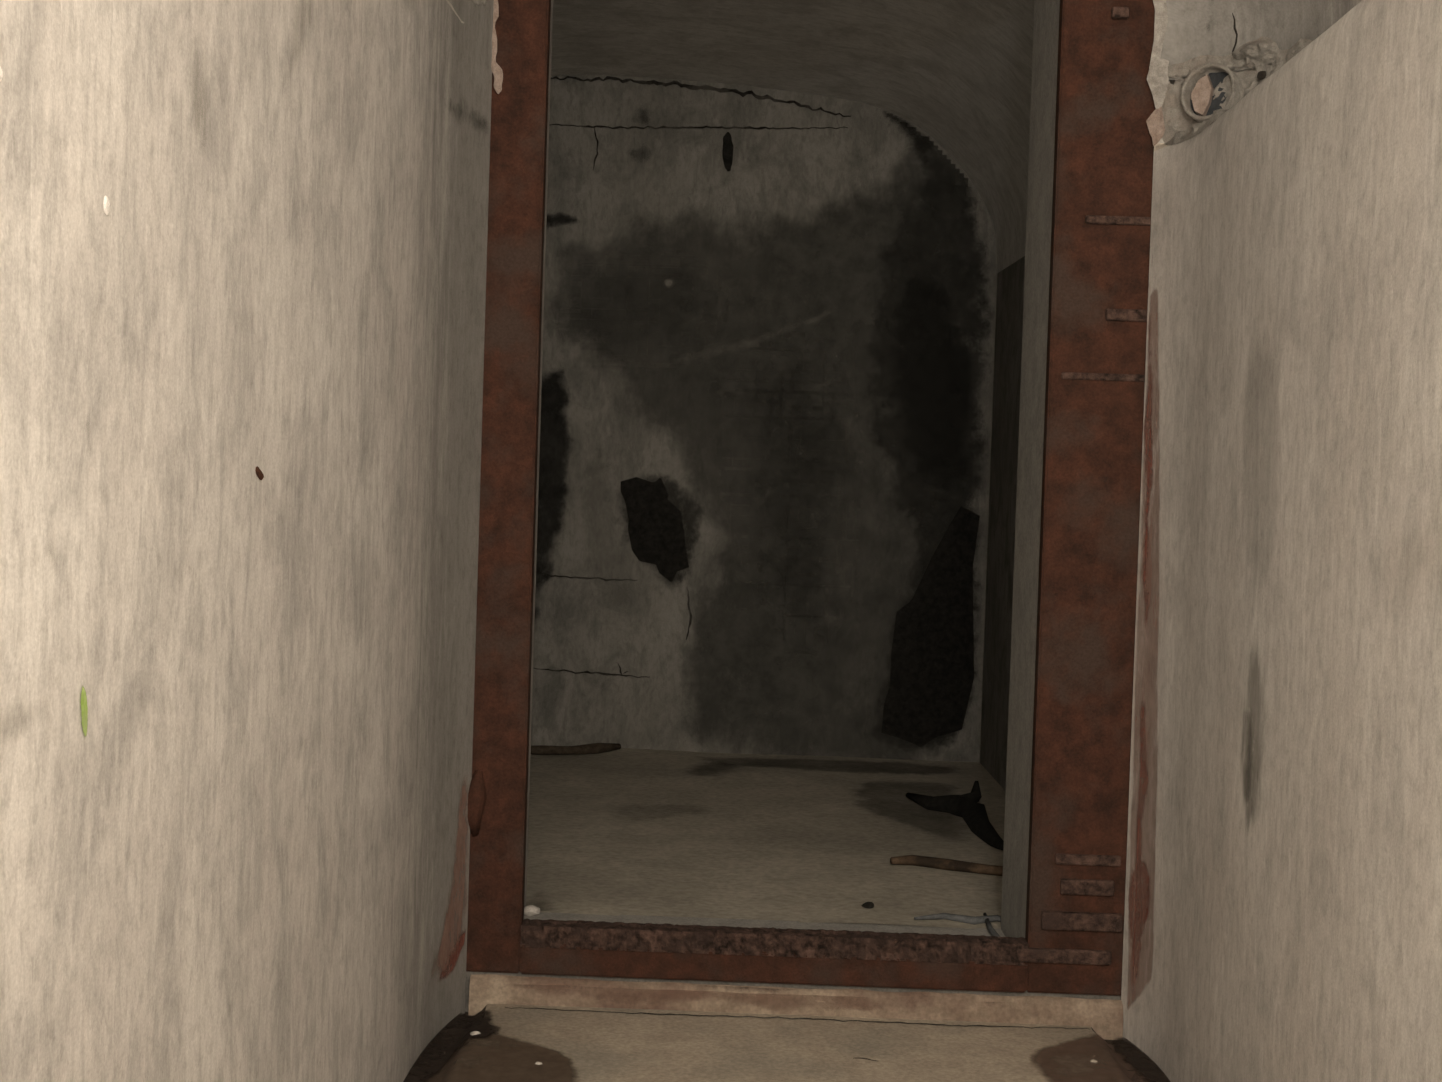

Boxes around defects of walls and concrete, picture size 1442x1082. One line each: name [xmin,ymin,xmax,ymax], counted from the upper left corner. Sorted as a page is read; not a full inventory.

flaking render [1146,0,1169,146]
water stain [546,213,576,226]
water stain [536,372,570,587]
water stain [565,113,990,760]
corrosion [1128,292,1159,1008]
corrosion [520,918,1029,966]
water stain [403,1011,576,1082]
water stain [1033,1035,1170,1082]